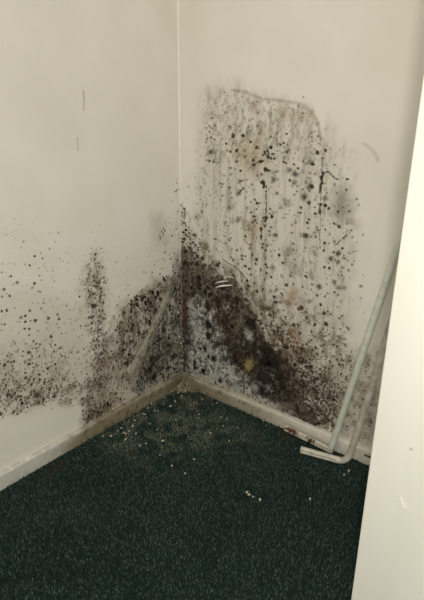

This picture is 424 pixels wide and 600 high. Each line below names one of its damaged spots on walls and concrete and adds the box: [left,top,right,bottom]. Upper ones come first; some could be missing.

leakage [0,126,370,433]